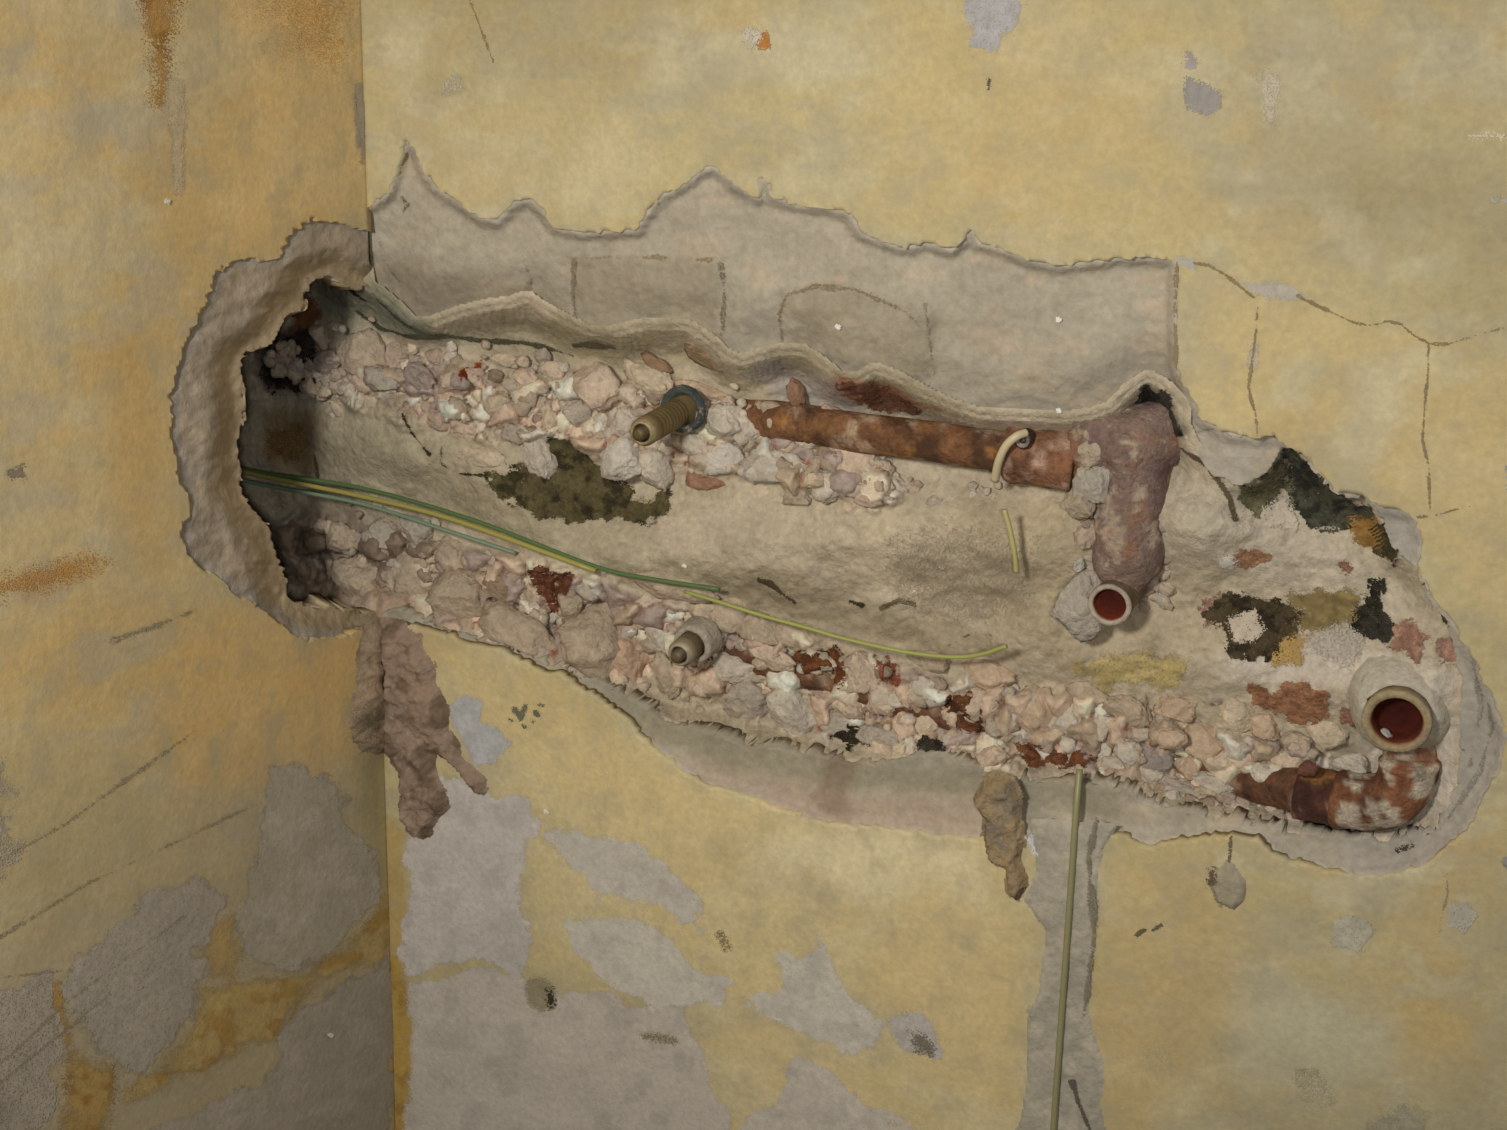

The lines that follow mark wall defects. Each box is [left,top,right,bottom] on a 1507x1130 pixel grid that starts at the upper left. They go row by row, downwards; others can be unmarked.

water stain [133,0,191,196]
peeling [961,0,1023,53]
crack [1173,255,1499,519]
spalling [169,141,1507,902]
peeling [396,692,542,978]
spalling [1206,860,1246,910]
water stain [49,889,416,1130]
peeling [885,1009,943,1060]